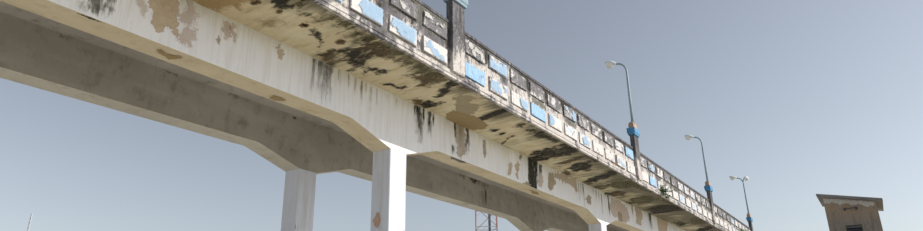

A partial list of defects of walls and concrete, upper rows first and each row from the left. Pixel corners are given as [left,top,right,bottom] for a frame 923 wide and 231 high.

damp [88,0,115,13]
flaking render [149,0,198,46]
damp [195,0,251,12]
flaking render [216,22,236,44]
flaking render [157,50,182,75]
damp [271,0,468,133]
flaking render [445,95,489,158]
flaking render [508,155,578,192]
damp [478,109,731,231]
flaking render [609,198,643,225]